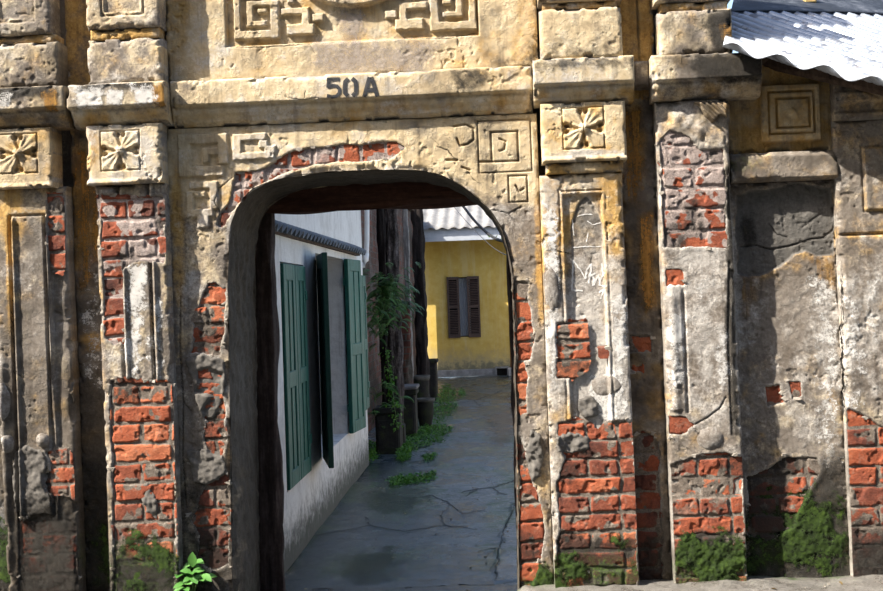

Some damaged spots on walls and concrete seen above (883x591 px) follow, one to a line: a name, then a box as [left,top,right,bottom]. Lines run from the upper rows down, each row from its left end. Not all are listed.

flaking render [96,193,166,345]
flaking render [218,141,405,228]
flaking render [655,131,729,251]
crack [741,216,834,250]
flaking render [555,318,613,381]
flaking render [45,447,75,500]
leakage [0,456,241,591]
flaking render [107,369,234,591]
crack [318,480,515,586]
flaking render [554,416,820,587]
leakage [745,274,883,578]
flaking render [846,408,883,577]